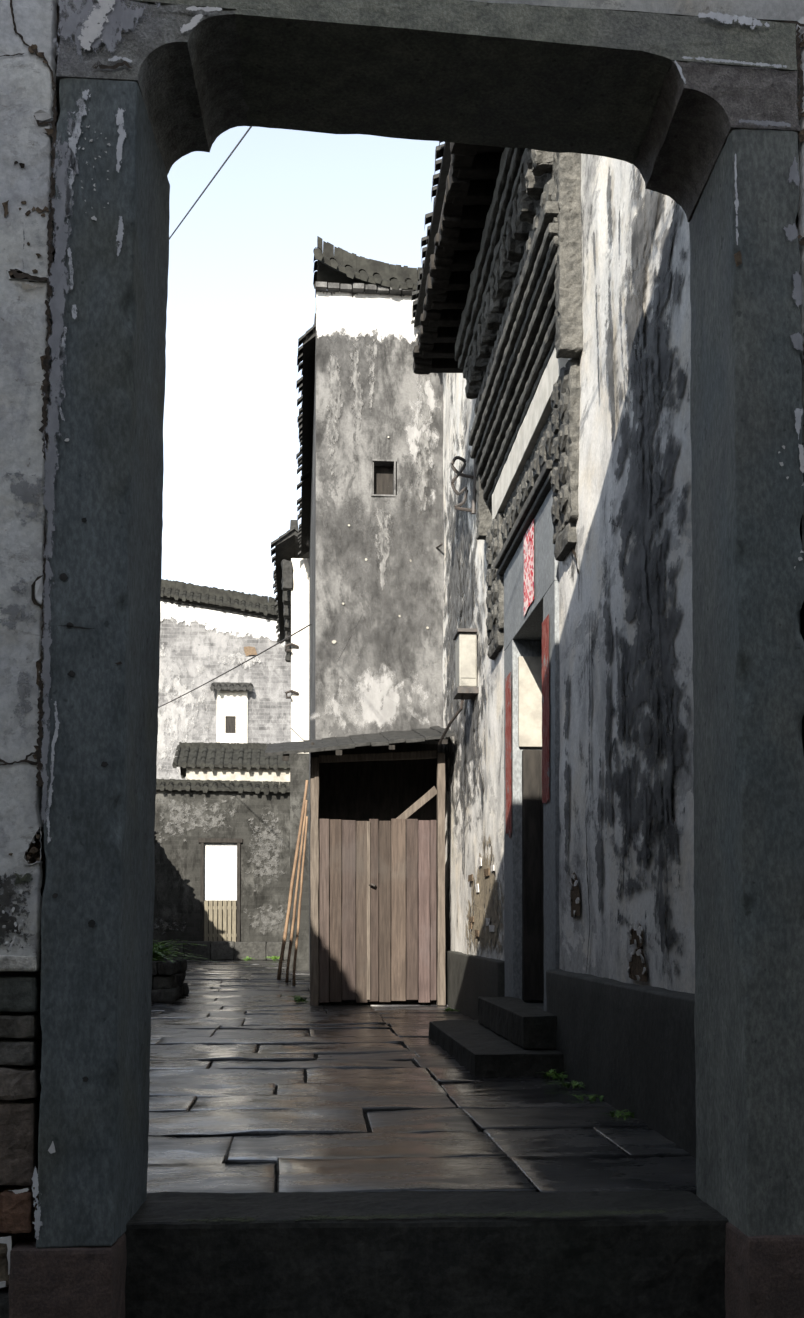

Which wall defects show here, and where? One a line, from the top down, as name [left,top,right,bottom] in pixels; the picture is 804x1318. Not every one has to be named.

crack [0,0,56,91]
leakage [588,164,690,974]
crack [0,745,44,787]
flaking render [465,833,504,959]
flaking render [568,872,580,918]
flaking render [626,921,647,982]